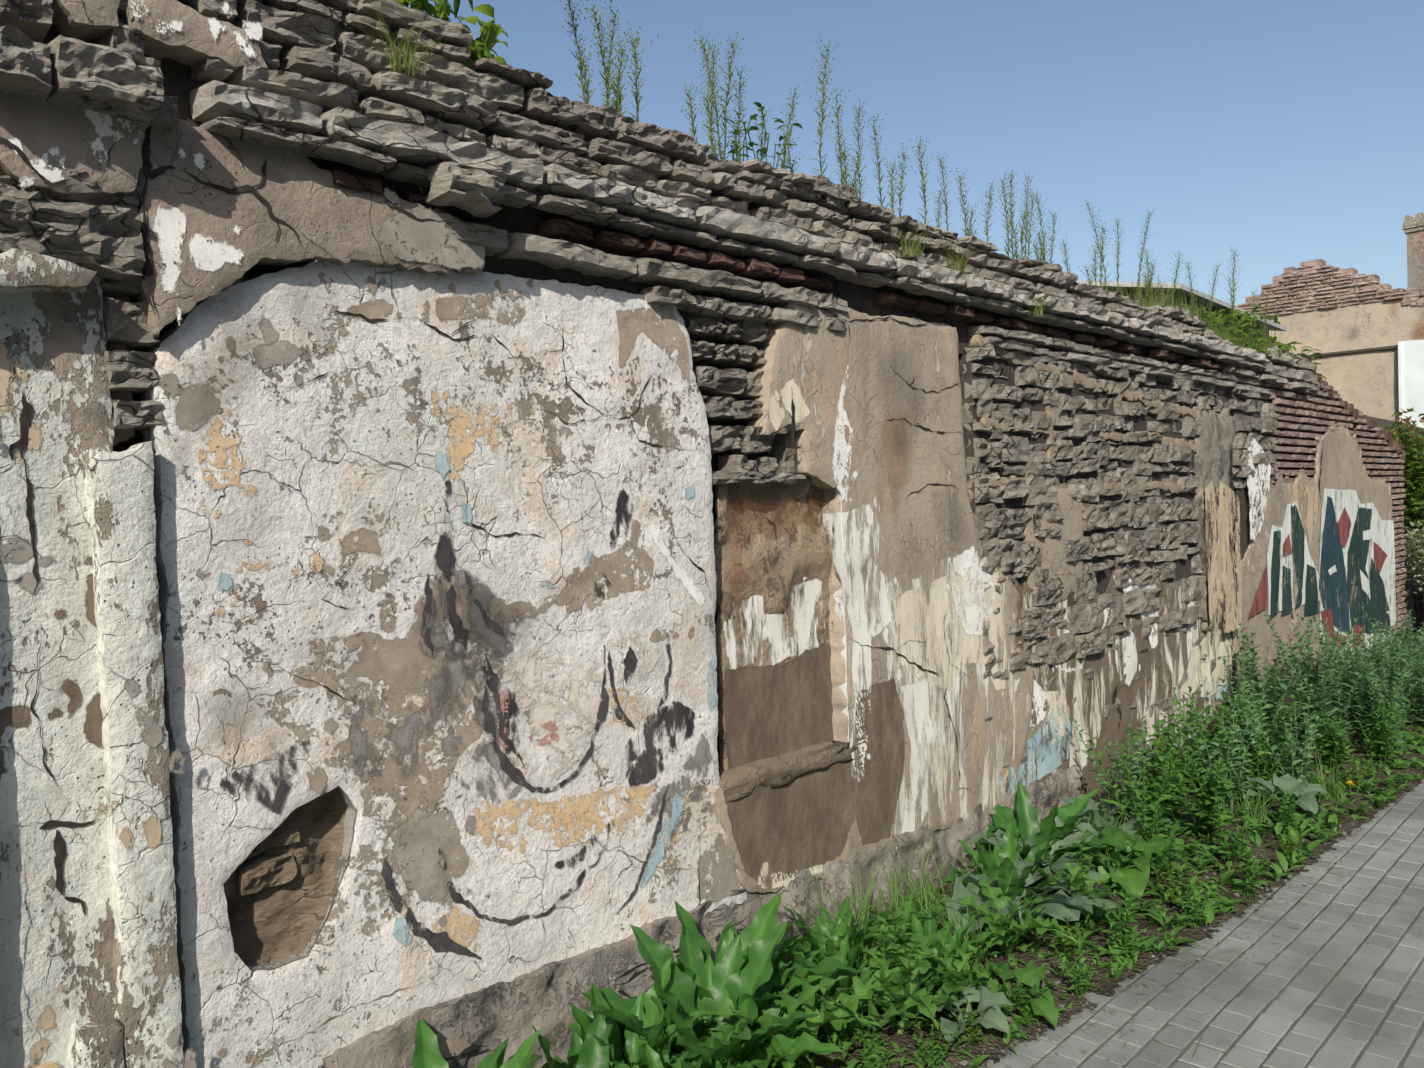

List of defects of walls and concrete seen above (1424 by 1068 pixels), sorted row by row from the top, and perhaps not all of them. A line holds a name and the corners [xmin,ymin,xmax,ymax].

crack [369,183,476,233]
flaking render [378,188,532,326]
peeling [158,366,258,518]
crack [320,308,696,480]
peeling [616,303,693,390]
crack [460,520,544,538]
flaking render [0,678,104,775]
flaking render [84,556,97,628]
crack [245,654,353,702]
crack [321,553,358,609]
peeling [223,501,707,970]
flaking render [697,365,1272,909]